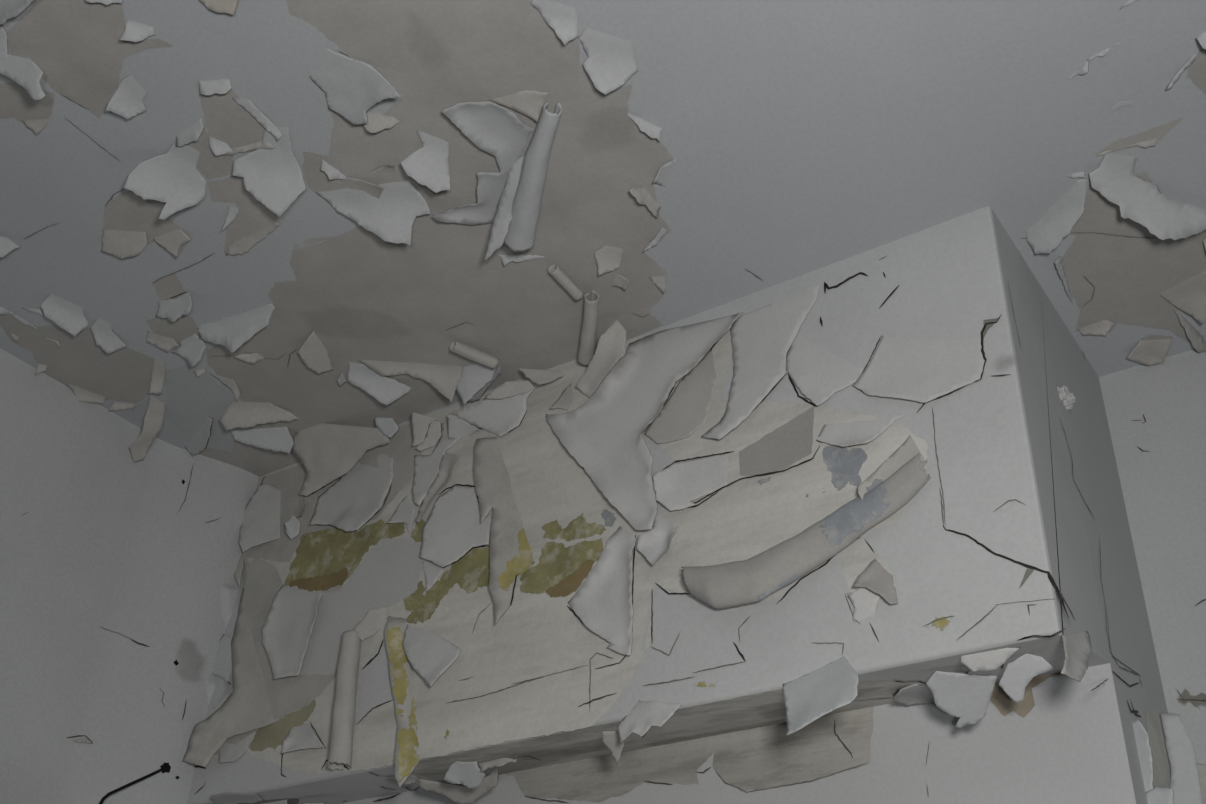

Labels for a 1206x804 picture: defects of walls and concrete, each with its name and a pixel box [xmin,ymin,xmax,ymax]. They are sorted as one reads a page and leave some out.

peeling [1166,31,1206,95]
peeling [0,0,676,477]
peeling [1023,117,1206,366]
peeling [183,285,1092,804]
peeling [1091,609,1206,804]
crack [1176,690,1206,706]